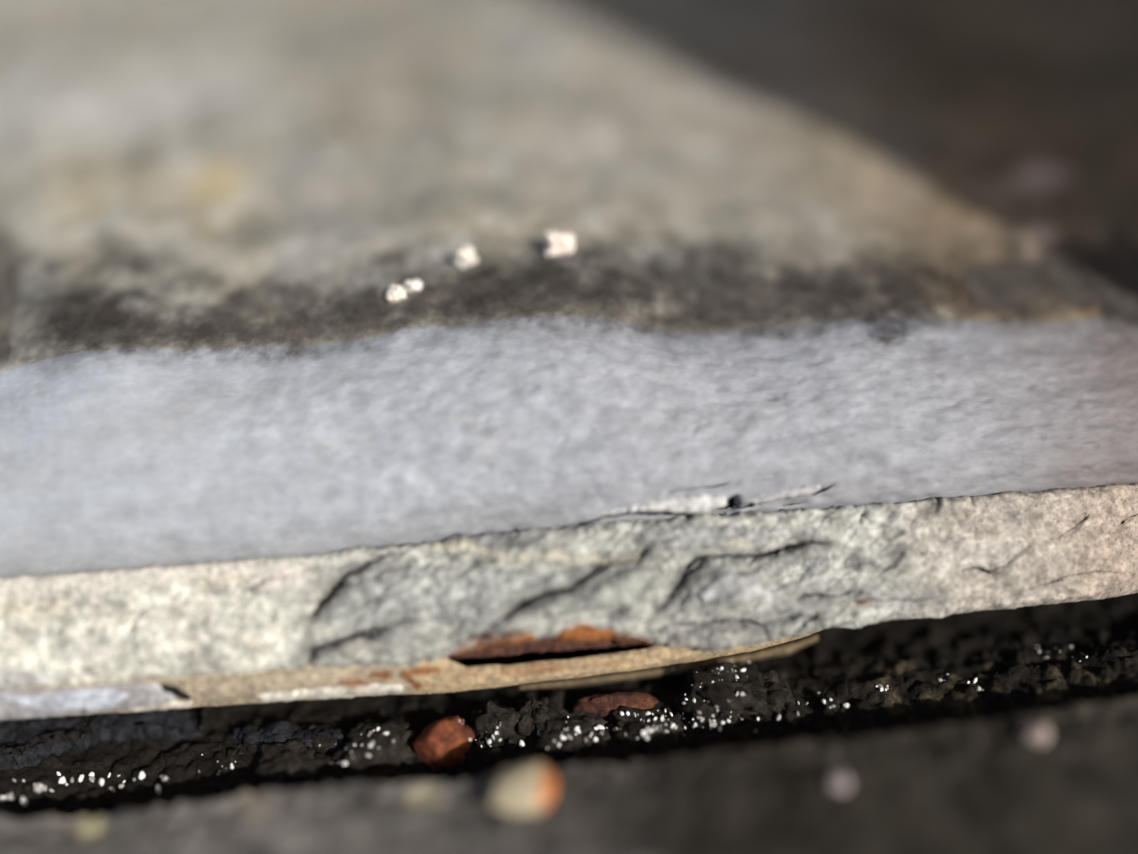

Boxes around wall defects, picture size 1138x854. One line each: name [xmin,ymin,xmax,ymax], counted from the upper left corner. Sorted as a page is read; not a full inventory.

crack [963,514,1090,574]
crack [311,552,397,617]
crack [309,619,417,661]
rust [448,624,651,659]
spalling [0,482,1138,739]
crack [438,540,929,655]
crack [1027,571,1113,591]
rust [342,668,441,690]